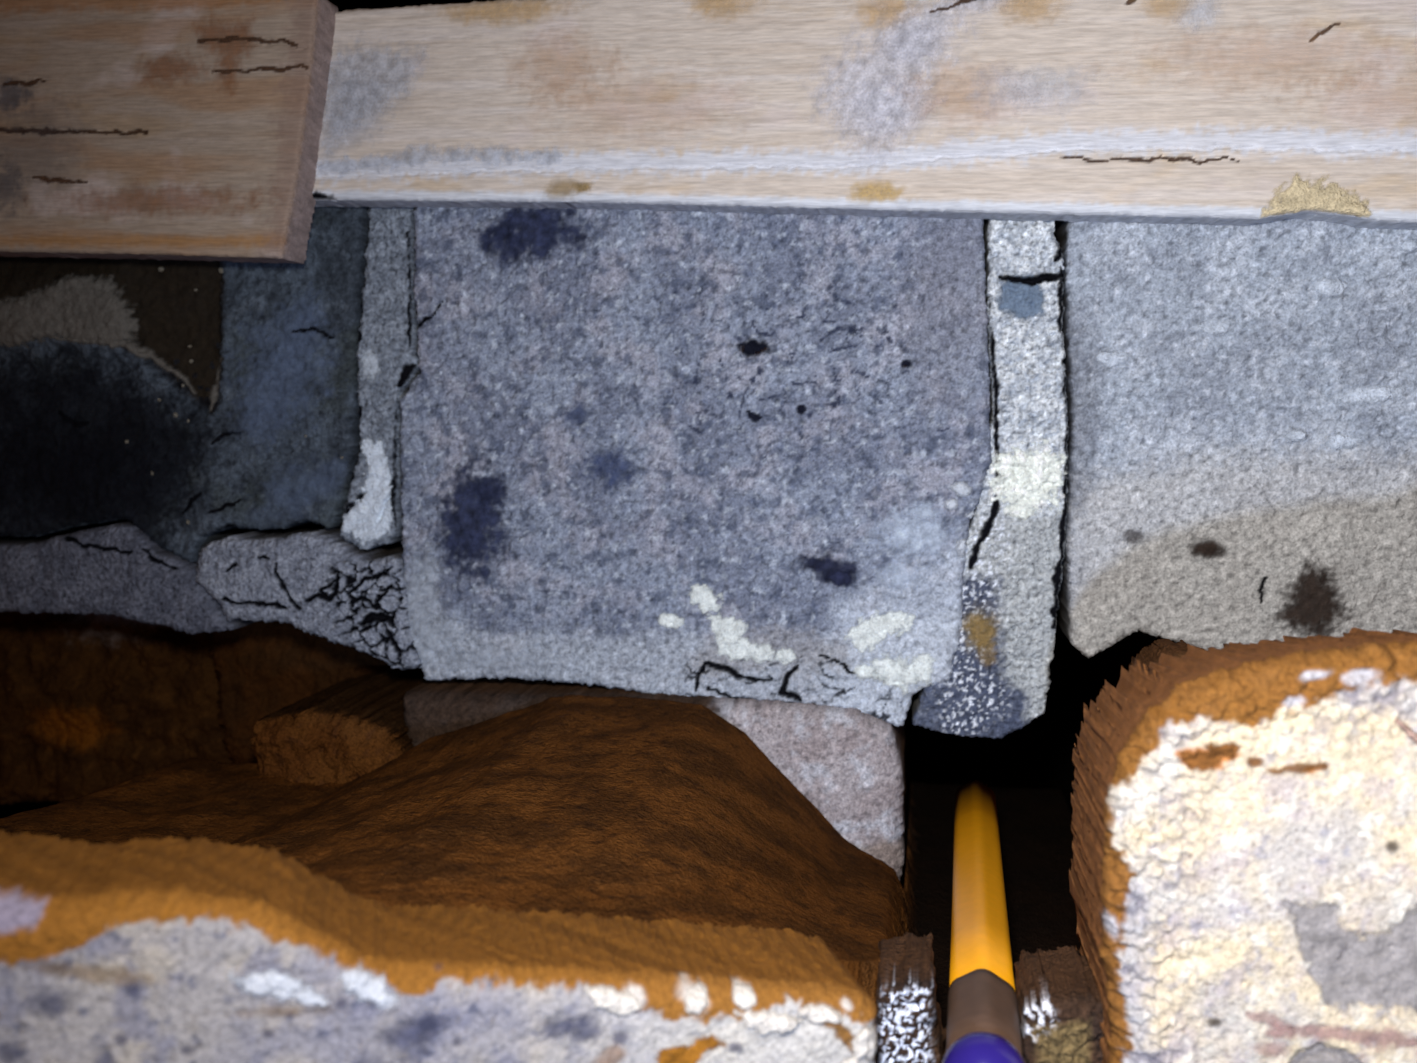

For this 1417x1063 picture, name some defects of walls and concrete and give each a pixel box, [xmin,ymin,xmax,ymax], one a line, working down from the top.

water stain [481,208,587,260]
water stain [363,350,380,377]
crack [211,431,241,445]
crack [222,231,443,669]
crack [969,247,1069,629]
crack [182,493,241,530]
water stain [342,439,393,545]
water stain [406,461,506,658]
water stain [658,584,796,665]
crack [686,654,898,721]
water stain [845,610,934,693]